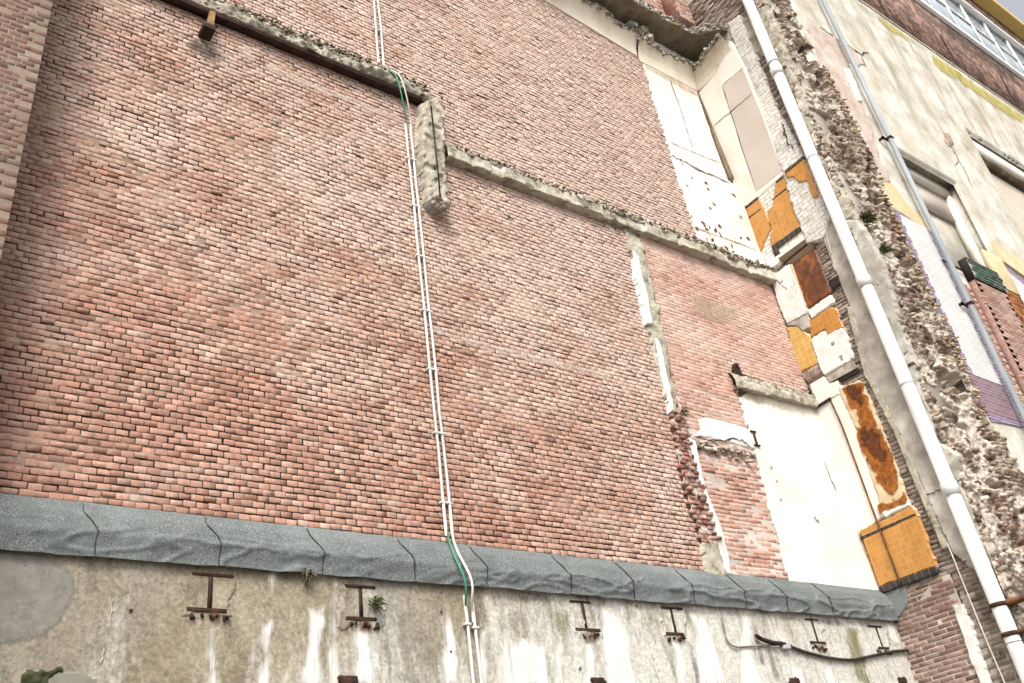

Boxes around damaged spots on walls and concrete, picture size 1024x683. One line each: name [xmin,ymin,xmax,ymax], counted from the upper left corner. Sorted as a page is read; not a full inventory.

spalling [692,438,757,463]
rust [843,382,907,514]
damp [208,649,216,683]
damp [252,620,272,683]
damp [303,609,339,683]
damp [355,626,375,683]
damp [442,617,458,683]
damp [479,631,563,683]
damp [582,608,636,683]
damp [673,614,726,683]